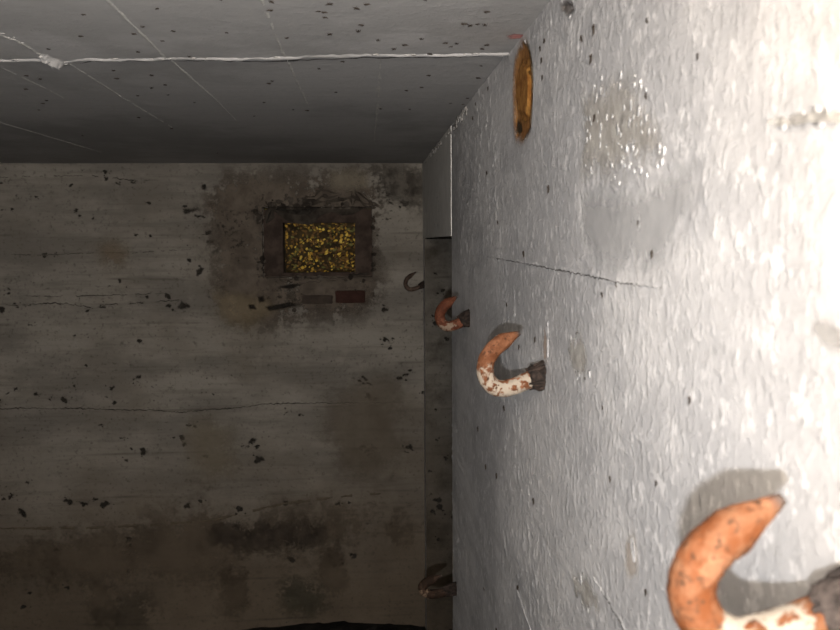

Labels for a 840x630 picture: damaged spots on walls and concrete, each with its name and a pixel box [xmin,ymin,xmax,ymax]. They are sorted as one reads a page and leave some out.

crack [69,56,504,64]
leakage [206,167,423,326]
crack [487,255,665,290]
leakage [0,509,368,627]
crack [593,577,626,630]